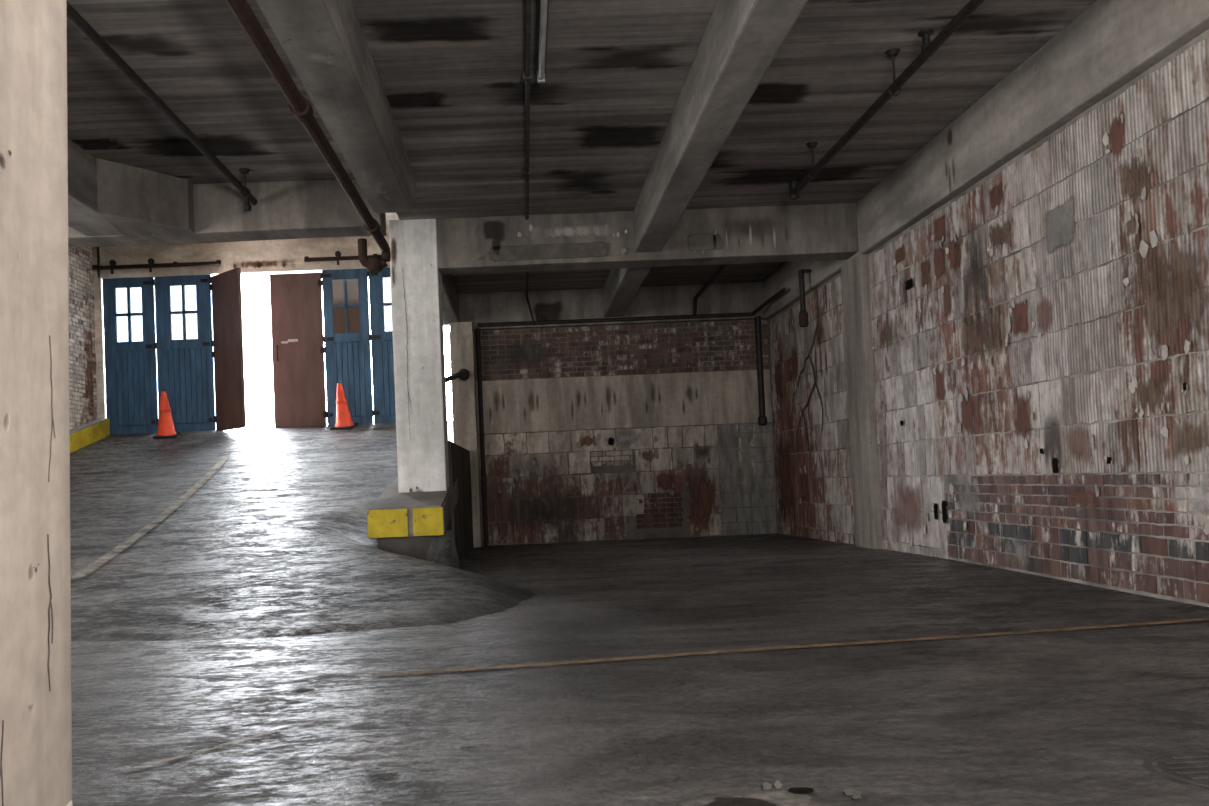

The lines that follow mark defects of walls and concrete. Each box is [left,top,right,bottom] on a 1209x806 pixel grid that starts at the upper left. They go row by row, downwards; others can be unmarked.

damp [371,18,489,42]
damp [580,125,661,147]
peeling [893,245,904,266]
peeling [905,215,1051,369]
peeling [987,183,1010,257]
peeling [1102,113,1209,361]
peeling [872,314,901,351]
peeling [933,367,974,434]
peeling [1016,391,1059,473]
peeling [1069,428,1112,465]
peeling [1128,377,1209,465]
crack [0,720,8,806]